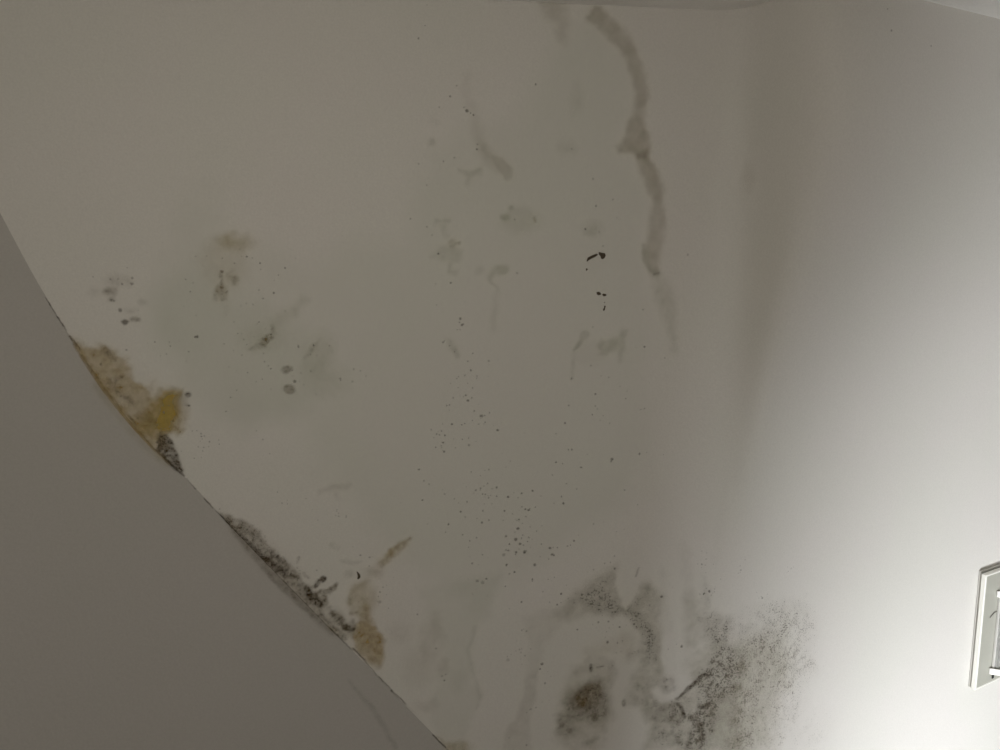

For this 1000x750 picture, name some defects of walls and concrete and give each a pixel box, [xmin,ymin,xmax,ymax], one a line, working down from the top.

damp [157,435,183,472]
damp [227,517,355,635]
damp [679,649,736,747]